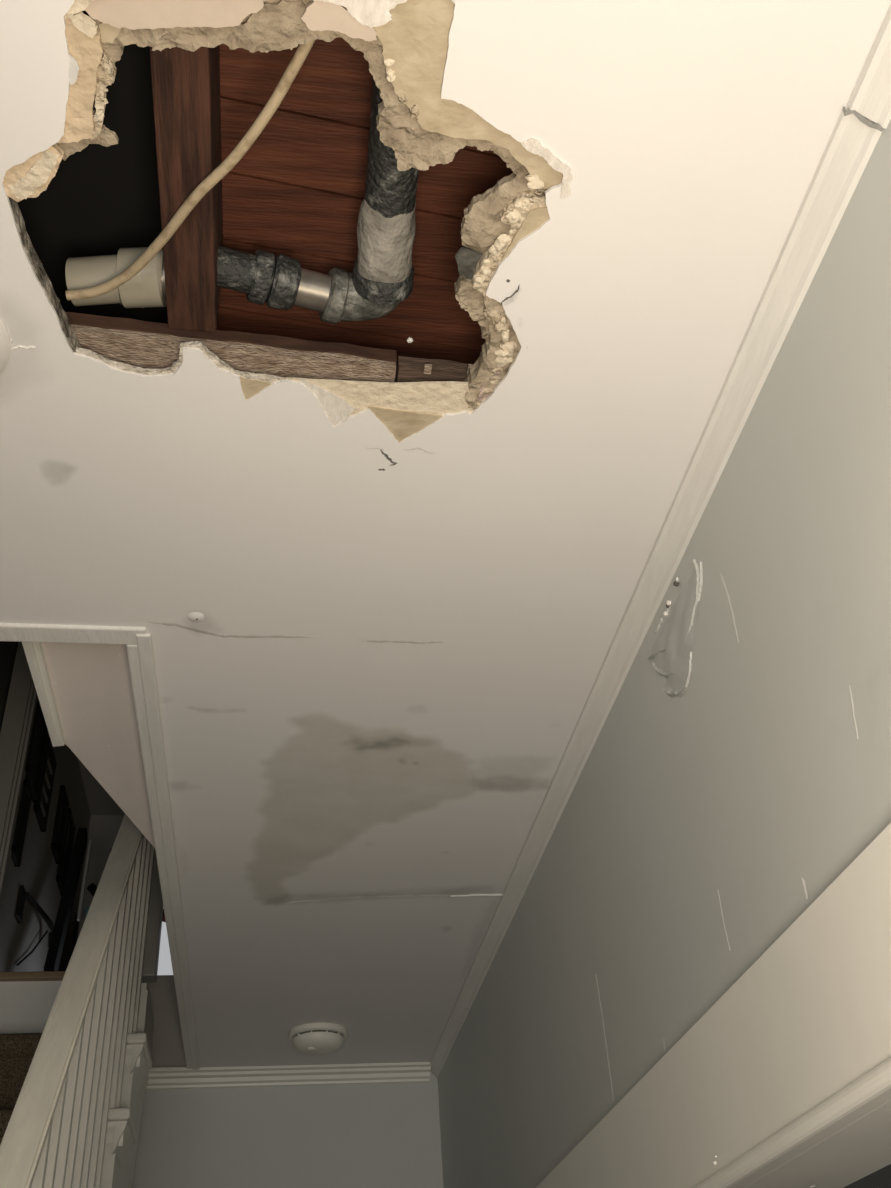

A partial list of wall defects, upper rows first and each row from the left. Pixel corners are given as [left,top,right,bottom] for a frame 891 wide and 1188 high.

peeling [301,0,377,41]
spalling [90,22,121,140]
peeling [522,138,573,199]
spalling [8,197,283,400]
spalling [454,246,521,412]
peeling [368,406,442,443]
crack [146,621,322,639]
crack [361,638,445,646]
peeling [648,558,703,698]